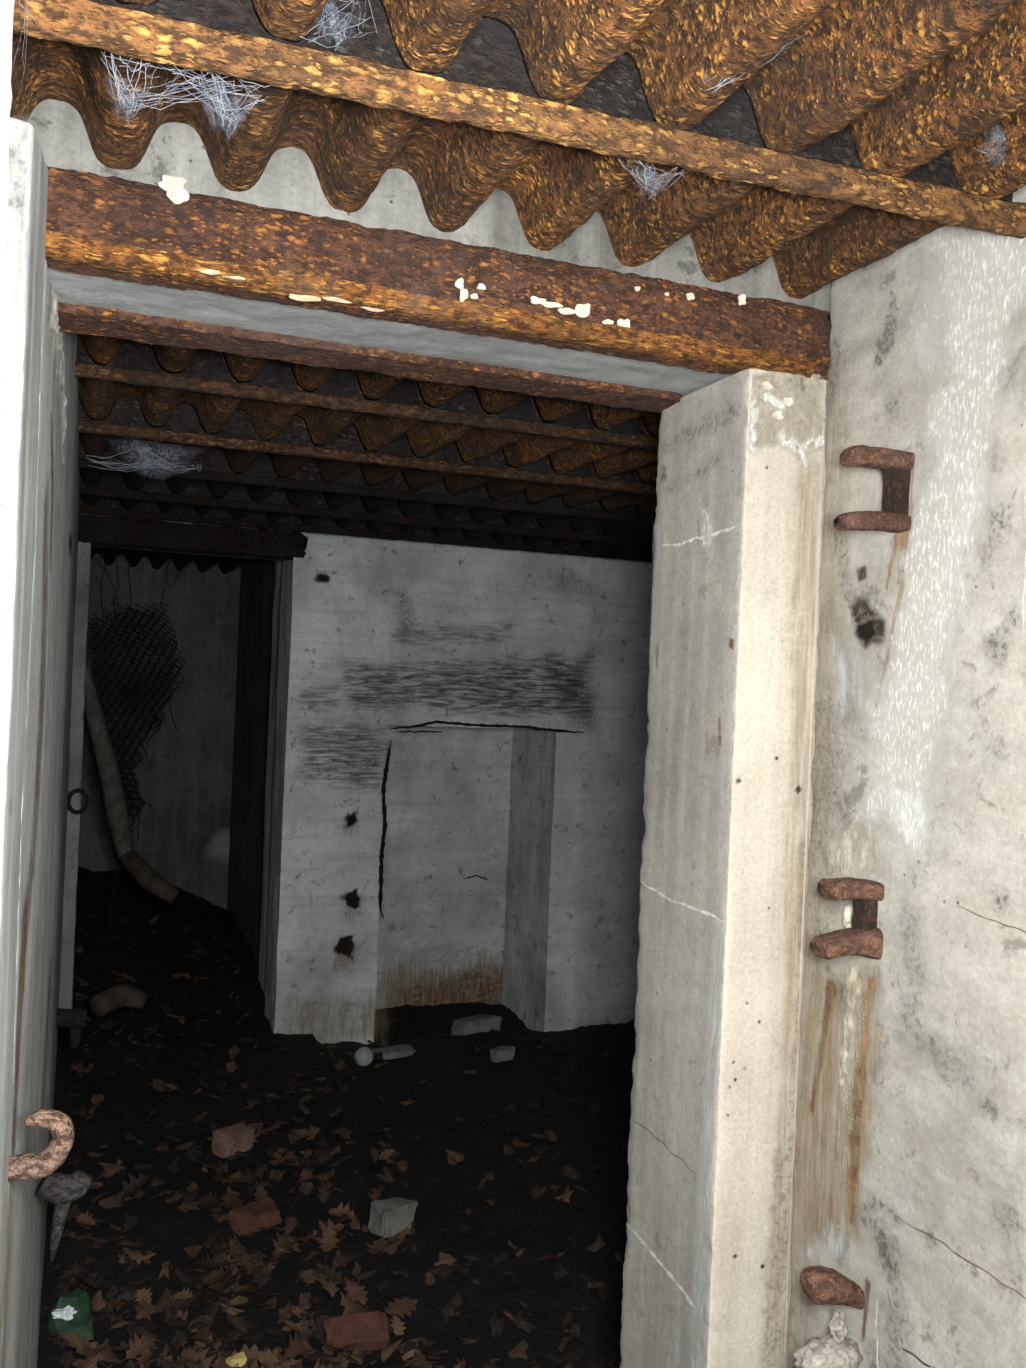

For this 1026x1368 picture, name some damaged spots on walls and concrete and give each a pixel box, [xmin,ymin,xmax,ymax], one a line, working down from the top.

crack [378,720,584,919]
rust [797,960,879,1257]
crack [875,1299,935,1368]
crack [900,1219,1025,1299]